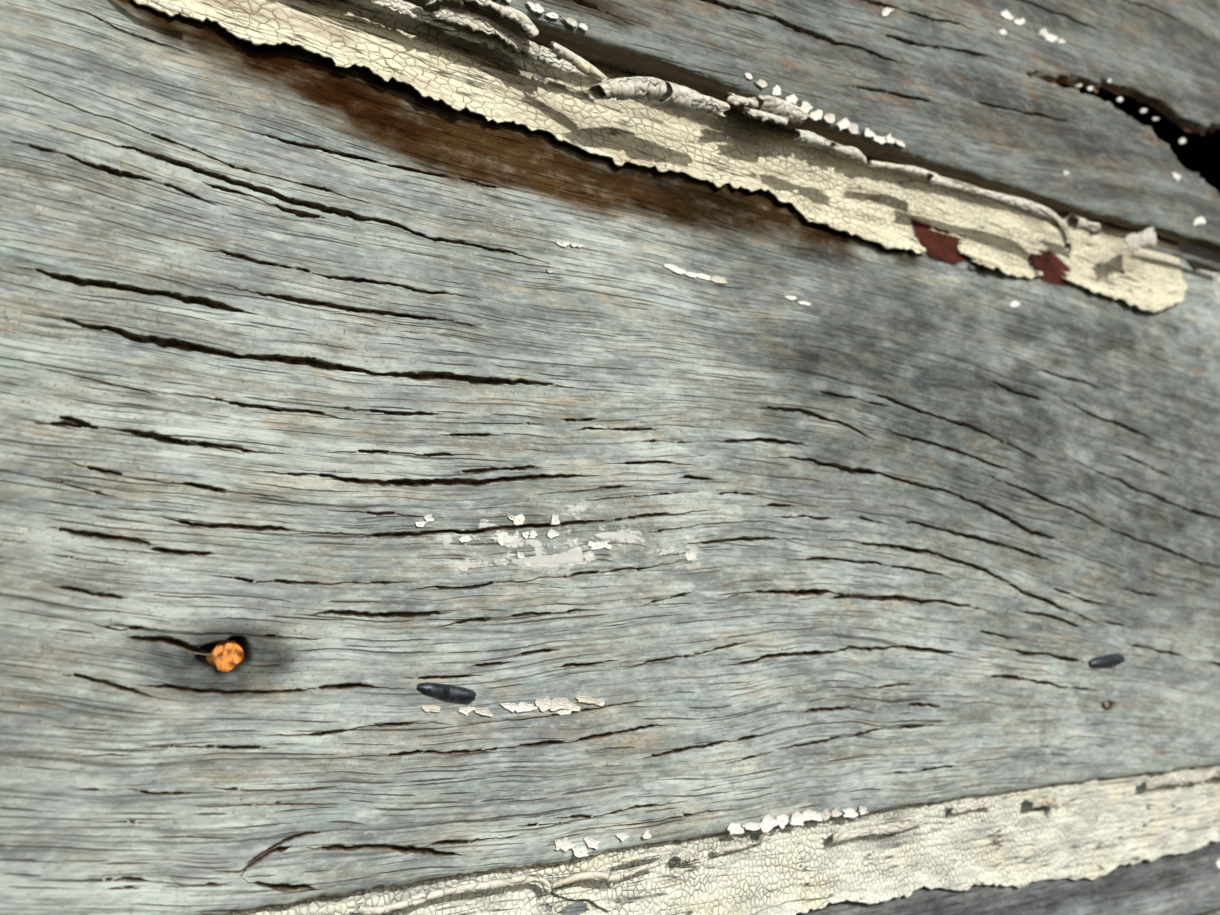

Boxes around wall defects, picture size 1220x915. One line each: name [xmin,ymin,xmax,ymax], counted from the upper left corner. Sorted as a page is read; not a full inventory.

crack [11,80,550,264]
peeling [133,0,1220,312]
crack [20,248,480,325]
crack [22,312,564,387]
peeling [415,514,434,528]
peeling [495,513,560,567]
peeling [583,541,612,562]
crack [37,369,1220,696]
crack [82,683,946,764]
peeling [458,695,605,717]
crack [81,786,734,892]
peeling [201,764,1220,915]